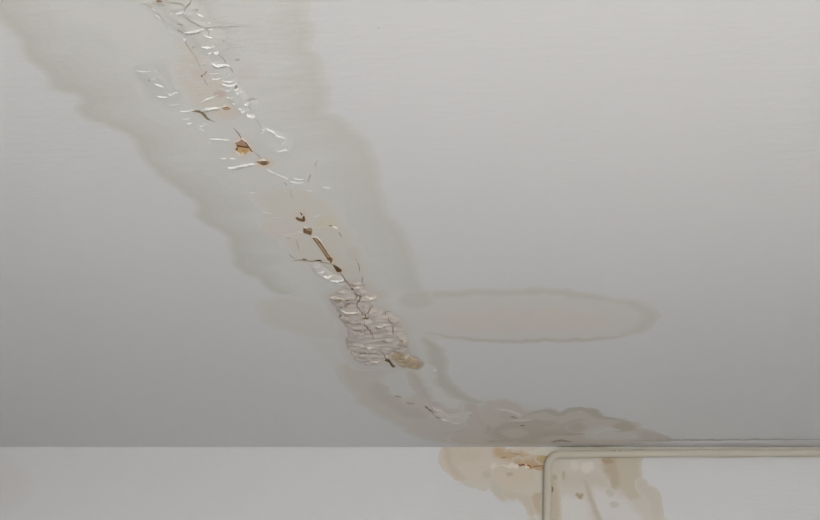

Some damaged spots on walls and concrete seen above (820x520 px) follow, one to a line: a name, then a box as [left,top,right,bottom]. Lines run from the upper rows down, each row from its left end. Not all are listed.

crack [139,0,240,86]
peeling [136,14,255,131]
crack [191,110,217,122]
flaking render [210,138,303,184]
damp [0,0,672,440]
crack [287,238,407,359]
peeling [296,212,412,368]
damp [253,290,820,456]
damp [438,447,543,520]
damp [552,457,671,520]